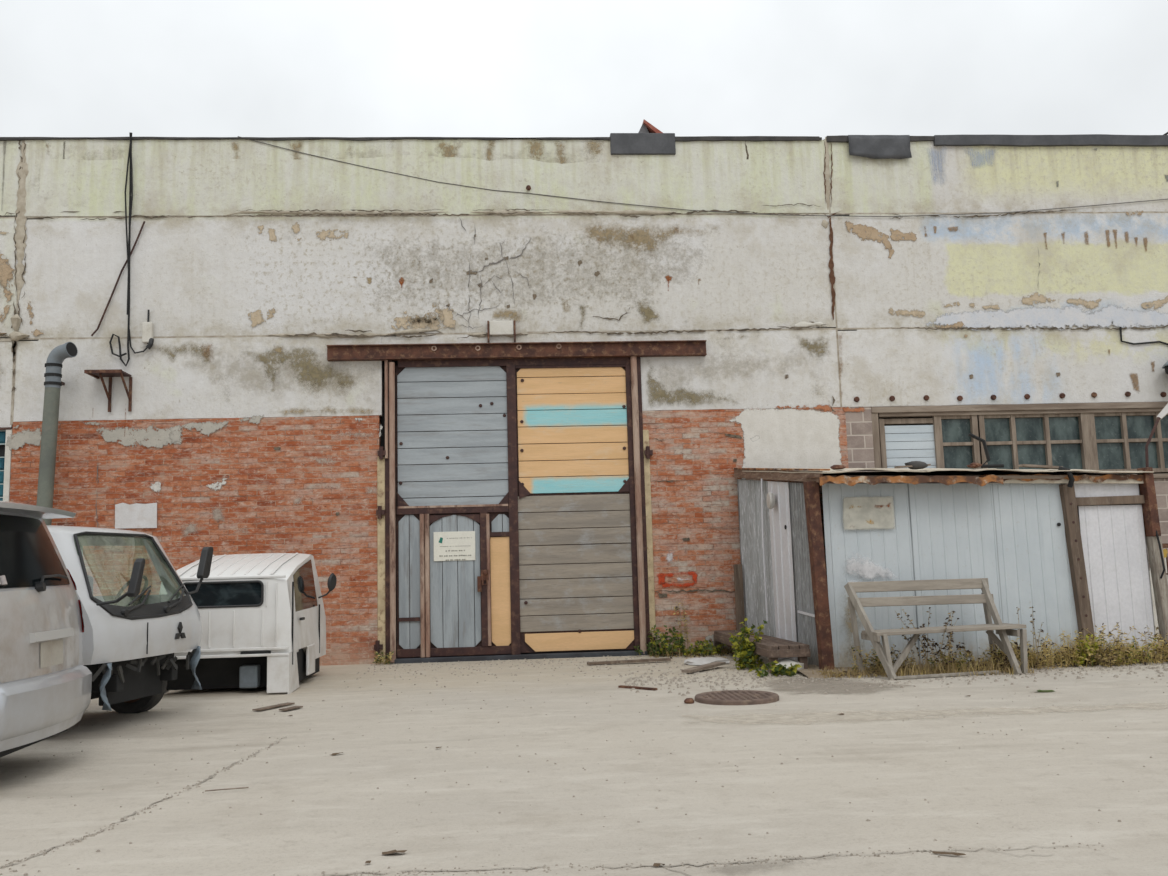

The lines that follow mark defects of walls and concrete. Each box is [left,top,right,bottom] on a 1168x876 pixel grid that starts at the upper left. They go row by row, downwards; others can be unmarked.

crack [228,139,841,338]
peeling [845,221,917,258]
peeling [0,254,14,323]
crack [0,140,198,408]
spalling [248,308,276,328]
peeling [391,303,456,330]
peeling [889,292,1168,338]
damp [165,346,210,361]
damp [256,347,352,387]
corrosion [807,474,1144,486]